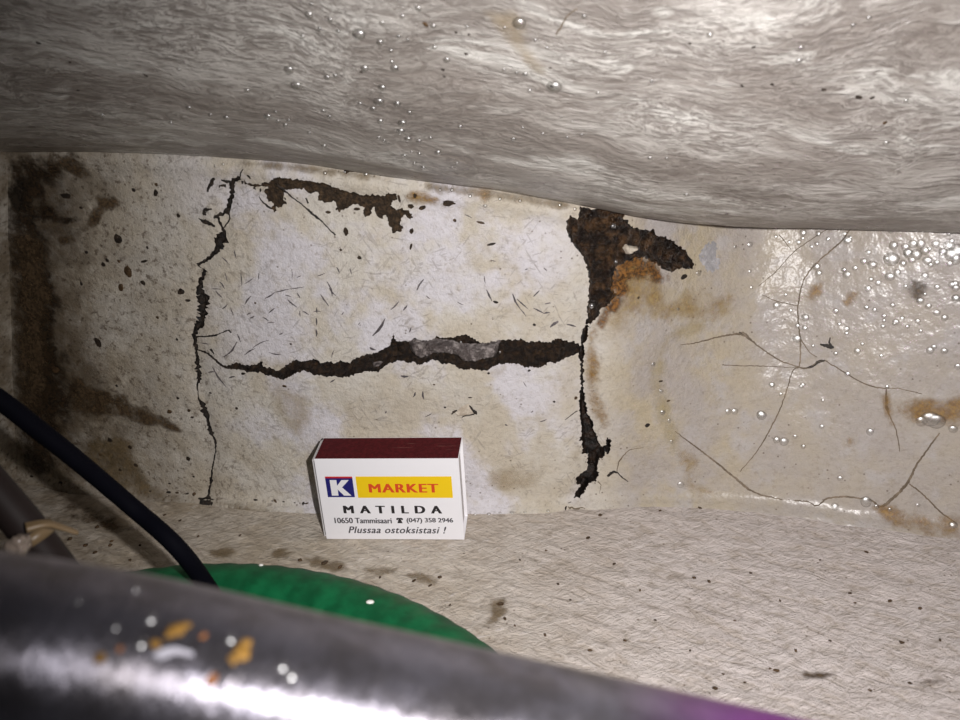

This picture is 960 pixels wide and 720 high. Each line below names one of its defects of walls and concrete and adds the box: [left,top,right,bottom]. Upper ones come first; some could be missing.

damp [8,181,26,210]
damp [101,258,146,291]
rust [598,257,662,328]
crack [192,169,640,510]
crack [675,229,957,524]